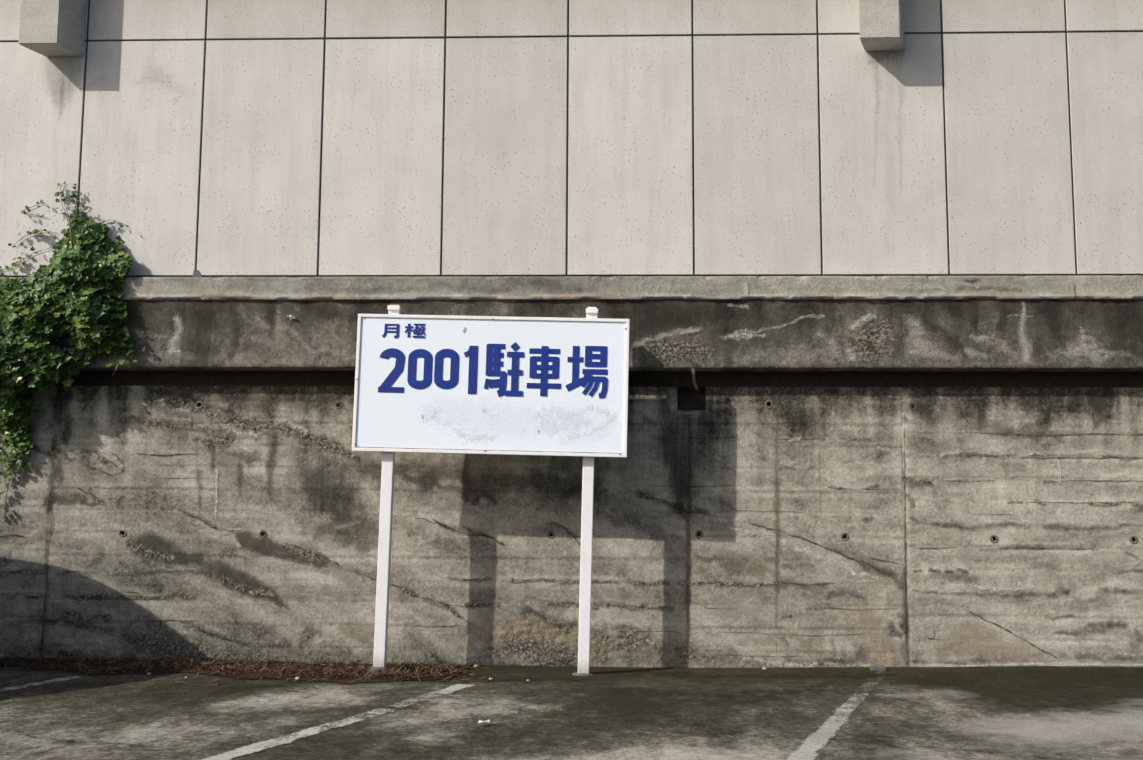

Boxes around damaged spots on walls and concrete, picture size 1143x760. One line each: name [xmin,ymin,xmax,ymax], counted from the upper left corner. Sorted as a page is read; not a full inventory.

water stain [663,404,719,517]
crack [928,601,1057,661]